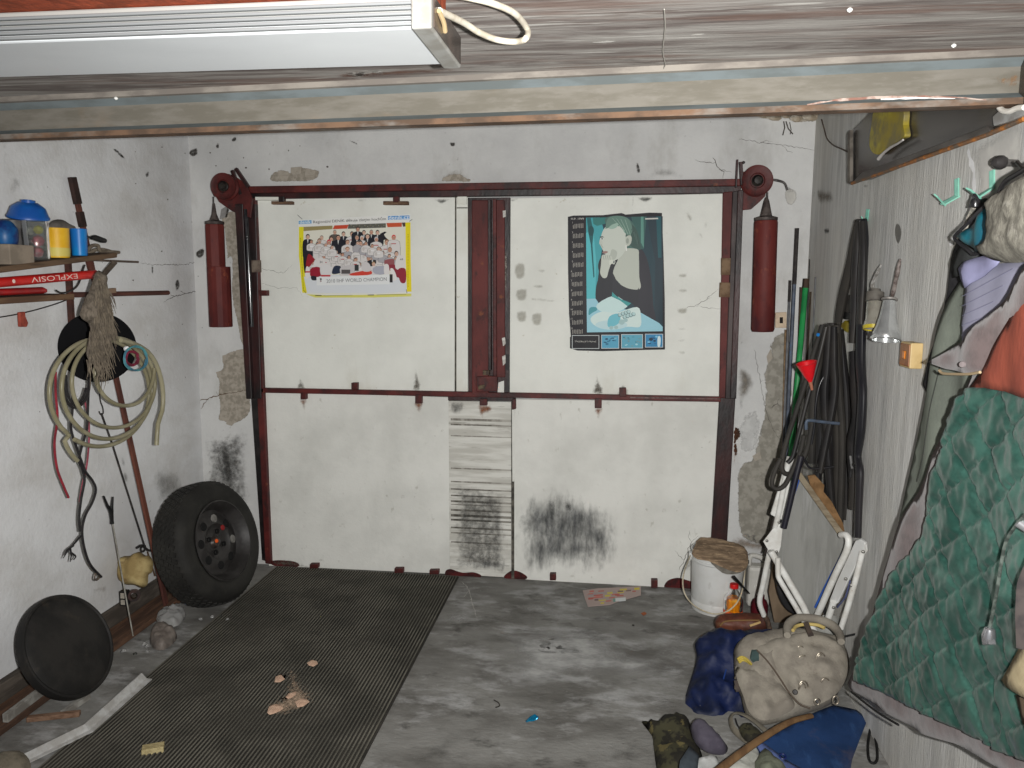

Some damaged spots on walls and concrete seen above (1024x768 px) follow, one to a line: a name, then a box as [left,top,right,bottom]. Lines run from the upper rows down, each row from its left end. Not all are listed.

peeling [270,167,319,182]
peeling [216,207,250,426]
leakage [209,441,244,499]
peeling [738,333,792,545]
leakage [462,495,499,565]
leakage [533,505,604,561]